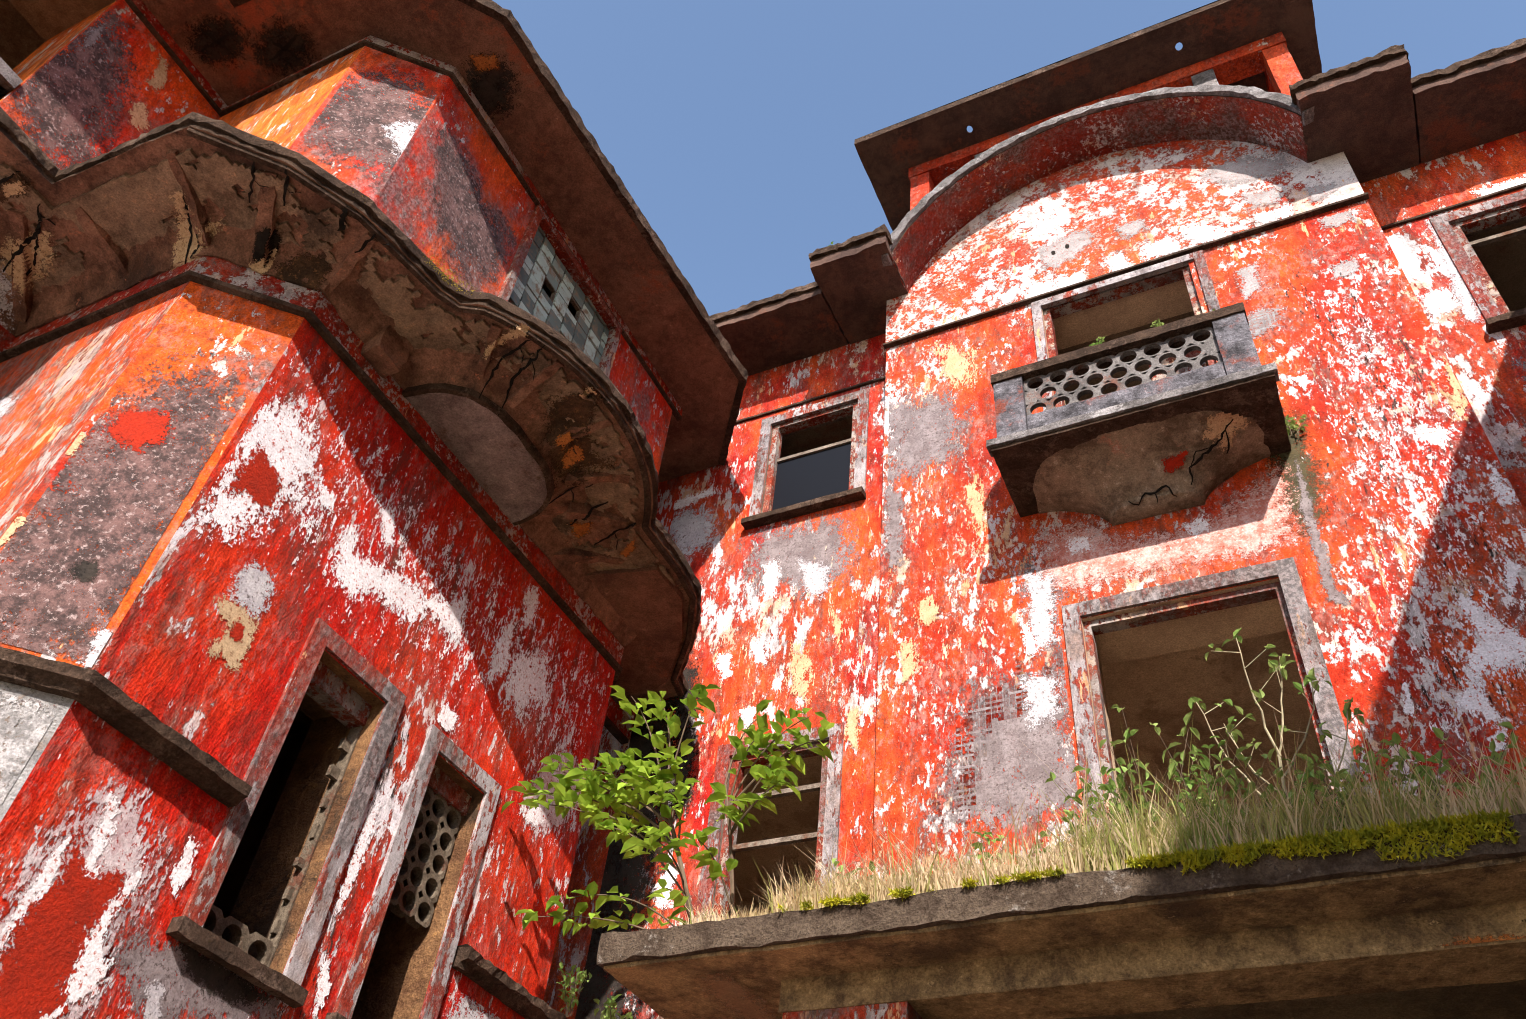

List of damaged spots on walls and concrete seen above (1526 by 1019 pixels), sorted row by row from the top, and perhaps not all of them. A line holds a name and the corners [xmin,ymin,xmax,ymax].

damp [183,8,322,78]
peeling [1253,203,1294,226]
peeling [1469,174,1526,196]
crack [1128,419,1233,506]
peeling [196,360,616,844]
peeling [670,485,874,783]
peeling [0,763,203,1019]
peeling [332,791,383,923]
peeling [650,863,679,911]
peeling [302,953,332,1019]
peeling [443,993,500,1019]